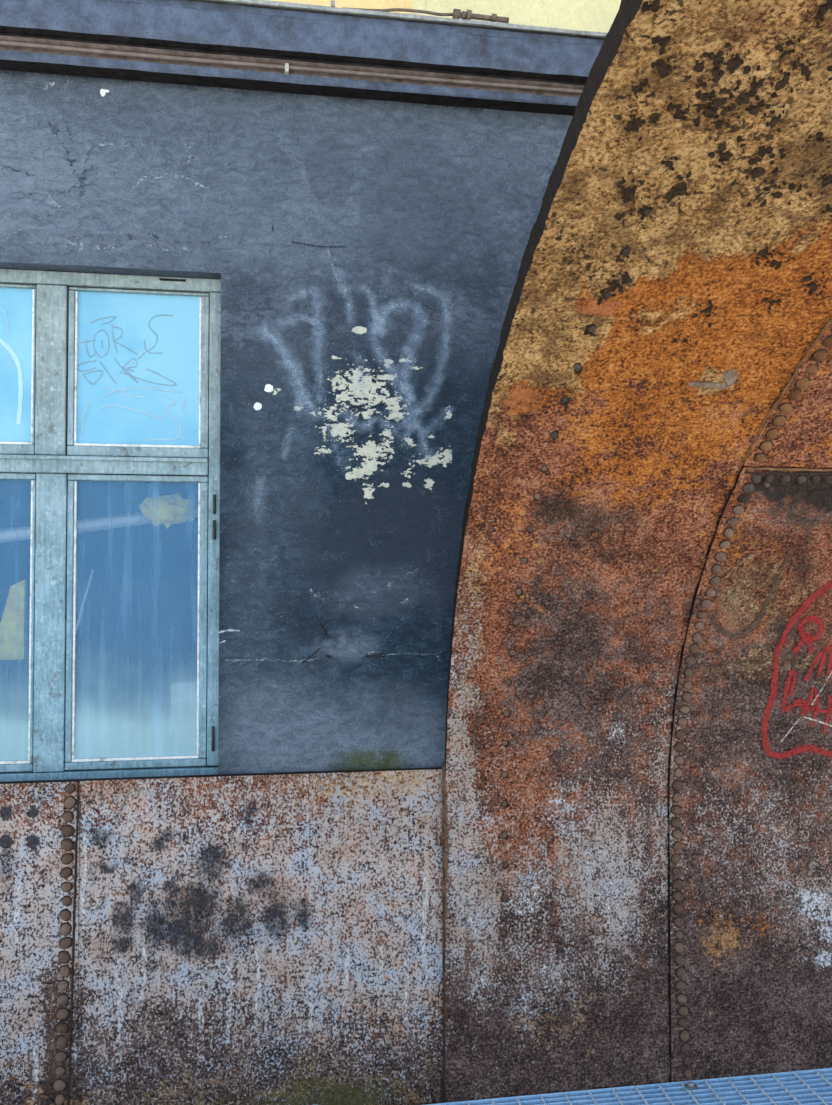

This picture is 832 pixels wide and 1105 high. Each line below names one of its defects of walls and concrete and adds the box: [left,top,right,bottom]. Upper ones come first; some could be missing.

crack [4,122,130,216]
crack [135,146,209,191]
crack [60,233,228,252]
corrosion [568,296,623,318]
corrosion [500,382,546,413]
peeling [294,355,452,504]
water stain [239,800,257,828]
water stain [154,827,177,851]
water stain [196,845,229,885]
corrosion [442,765,450,1026]
water stain [112,872,183,1001]
corrosion [699,913,771,970]